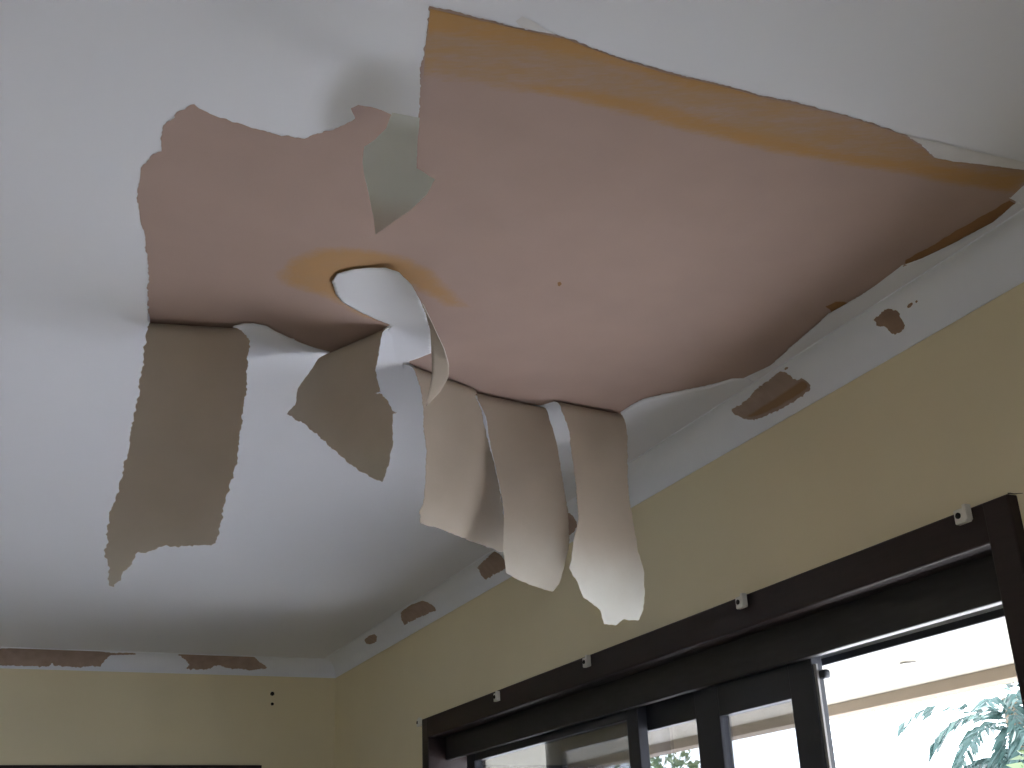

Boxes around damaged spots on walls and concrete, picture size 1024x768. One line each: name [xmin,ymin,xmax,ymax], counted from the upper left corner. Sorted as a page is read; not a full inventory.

water stain [423,8,1024,198]
peeling [427,6,1024,170]
water stain [272,242,478,325]
peeling [104,45,1021,625]
peeling [0,648,136,668]
peeling [179,654,267,671]